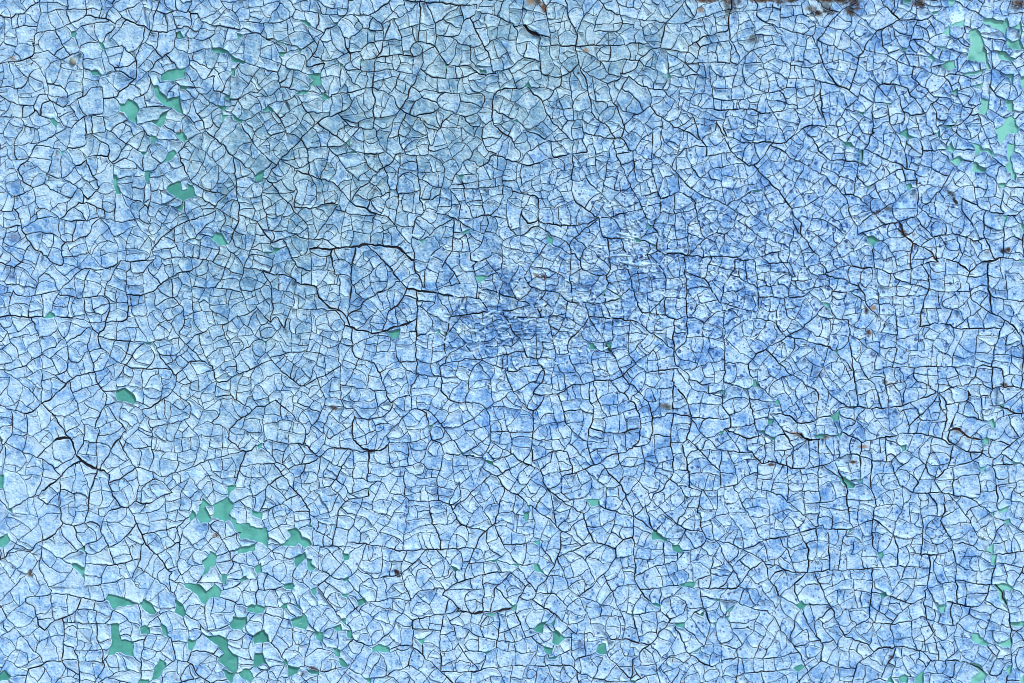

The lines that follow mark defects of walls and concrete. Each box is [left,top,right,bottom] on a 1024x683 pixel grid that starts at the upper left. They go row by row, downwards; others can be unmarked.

crack [0,6,241,683]
crack [87,0,287,99]
peeling [56,10,343,222]
crack [142,340,260,415]
peeling [199,221,239,257]
crack [185,128,255,174]
crack [227,0,1024,683]
peeling [846,0,1024,280]
peeling [49,432,440,683]